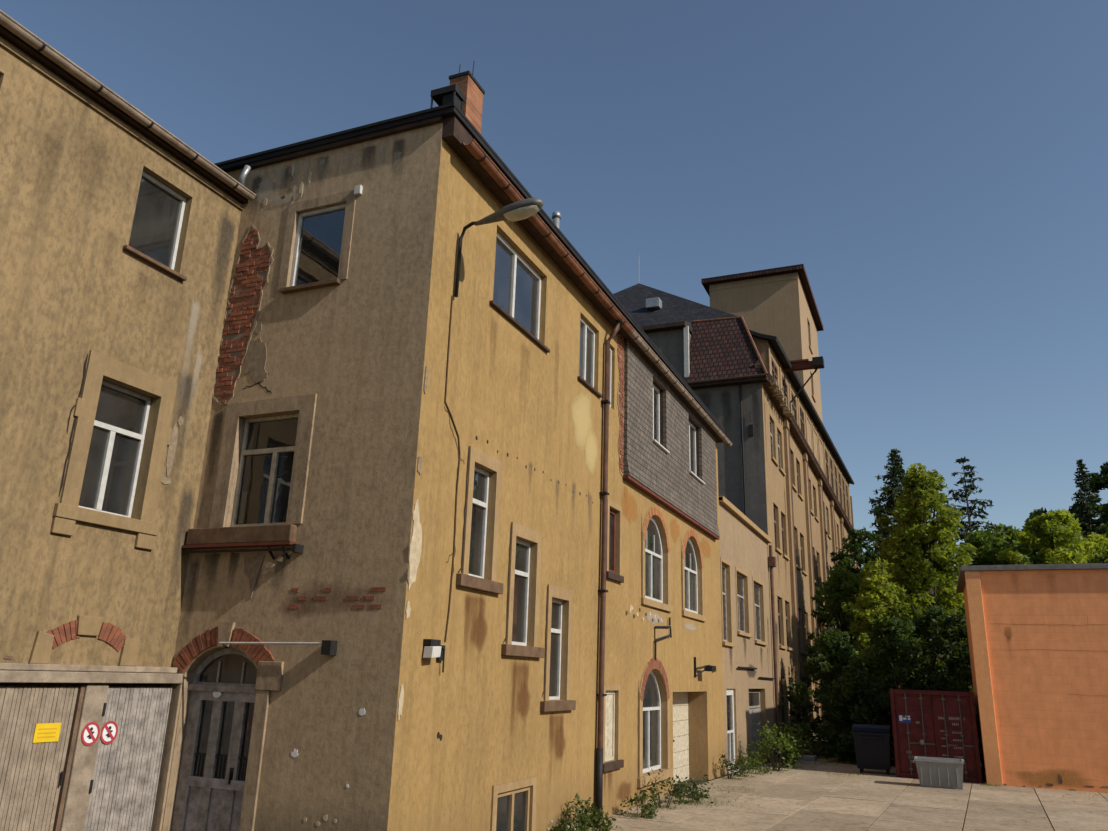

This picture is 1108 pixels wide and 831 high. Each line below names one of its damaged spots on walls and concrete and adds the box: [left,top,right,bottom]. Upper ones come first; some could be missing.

flaking render [212,224,274,406]